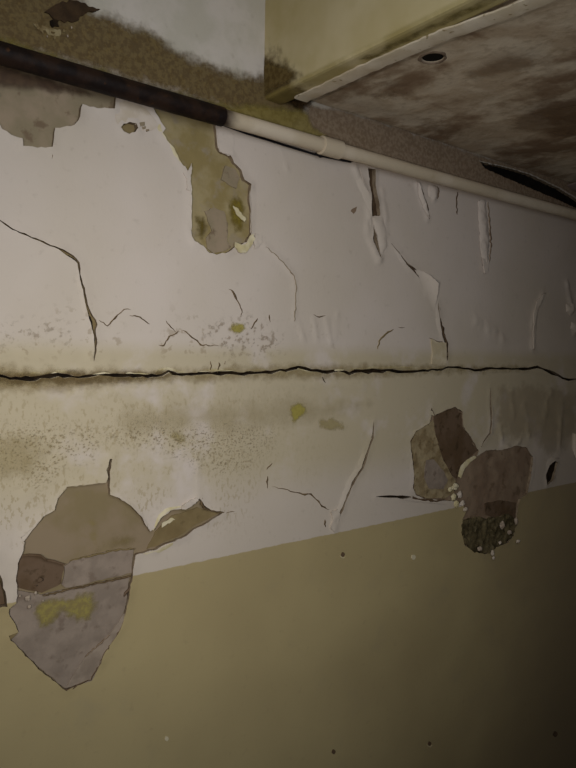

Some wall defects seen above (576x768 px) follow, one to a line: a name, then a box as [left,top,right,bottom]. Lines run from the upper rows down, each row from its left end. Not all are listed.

flaking render [0,65,115,157]
water stain [0,0,328,137]
flaking render [140,108,263,254]
peeling [356,168,387,255]
crack [0,223,572,383]
water stain [0,371,215,388]
crack [266,437,372,532]
flaking render [409,407,537,560]
peeling [546,456,559,483]
flaking render [0,465,234,691]